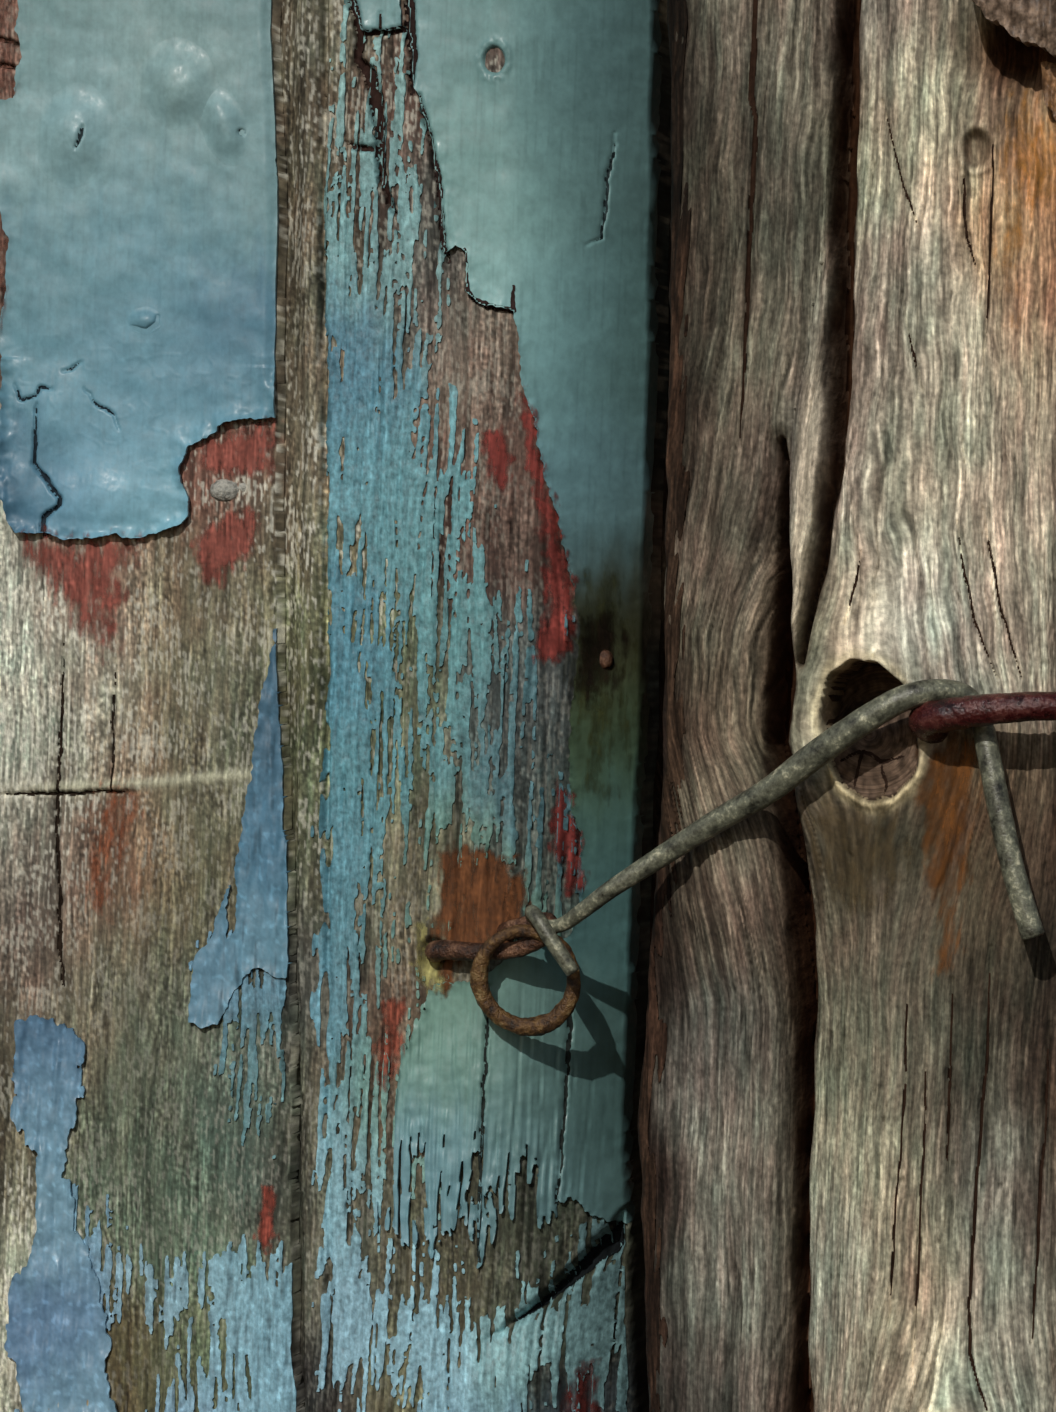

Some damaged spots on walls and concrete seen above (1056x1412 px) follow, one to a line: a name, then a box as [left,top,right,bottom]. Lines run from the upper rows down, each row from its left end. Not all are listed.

crack [348,0,516,313]
crack [17,363,79,538]
crack [4,643,130,986]
peeling [188,628,293,1146]
rust [439,960,462,997]
rust [430,845,532,943]
peeling [310,0,662,1412]
peeling [4,1015,297,1412]